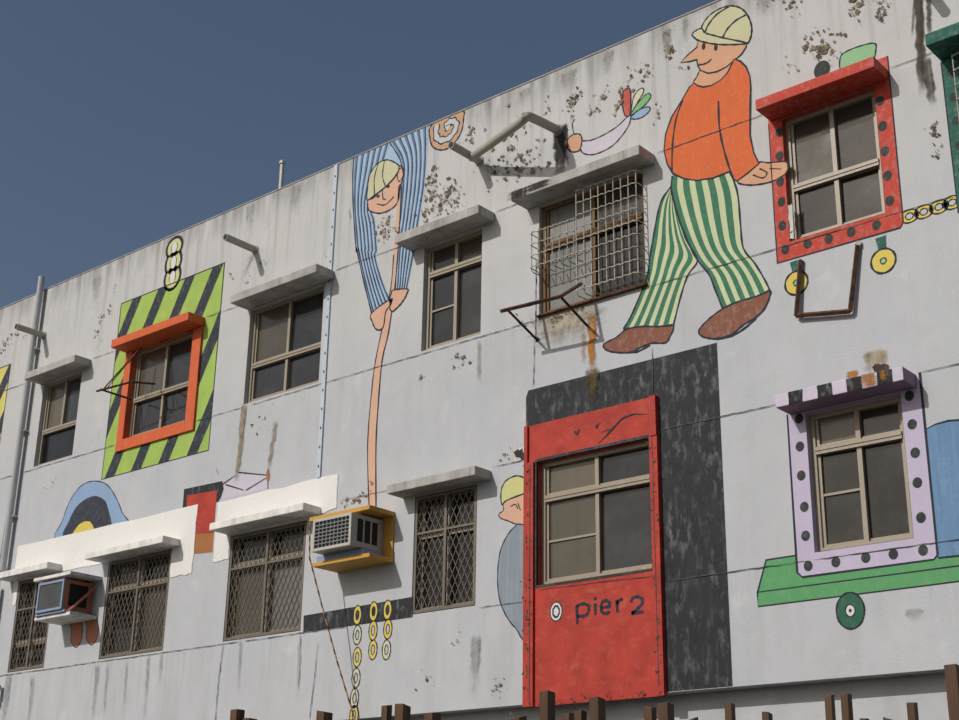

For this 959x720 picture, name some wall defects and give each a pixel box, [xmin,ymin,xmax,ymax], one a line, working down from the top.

peeling [848,0,891,23]
peeling [801,26,846,66]
leakage [912,0,935,98]
peeling [473,115,556,192]
peeling [413,165,464,227]
rust [587,316,597,392]
rust [847,350,885,386]